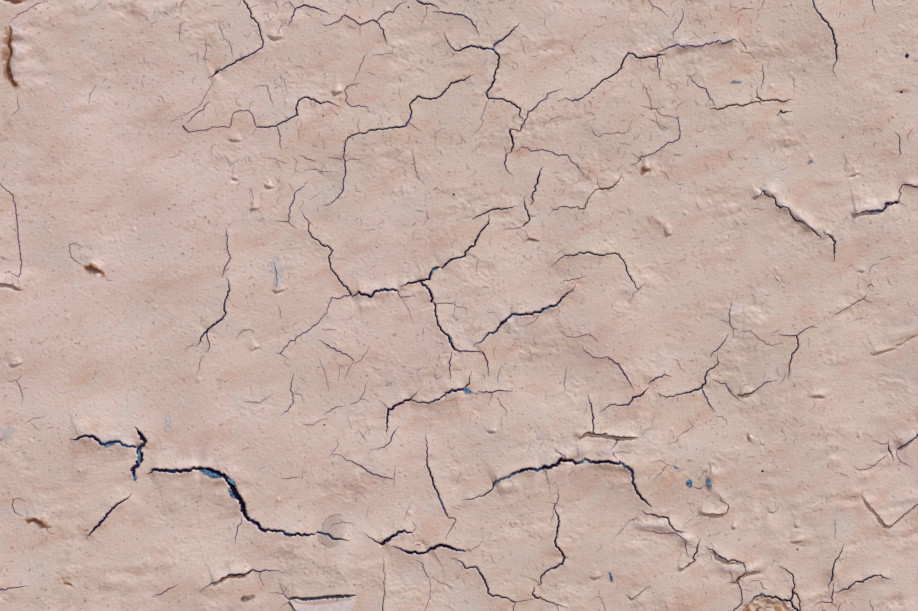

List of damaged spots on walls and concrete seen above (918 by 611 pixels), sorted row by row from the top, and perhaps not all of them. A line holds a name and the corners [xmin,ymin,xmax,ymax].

crack [4,1,59,125]
crack [0,184,30,291]
crack [171,0,891,611]
crack [1,345,45,449]
crack [72,412,350,592]
crack [835,417,918,498]
flaking render [269,582,356,611]